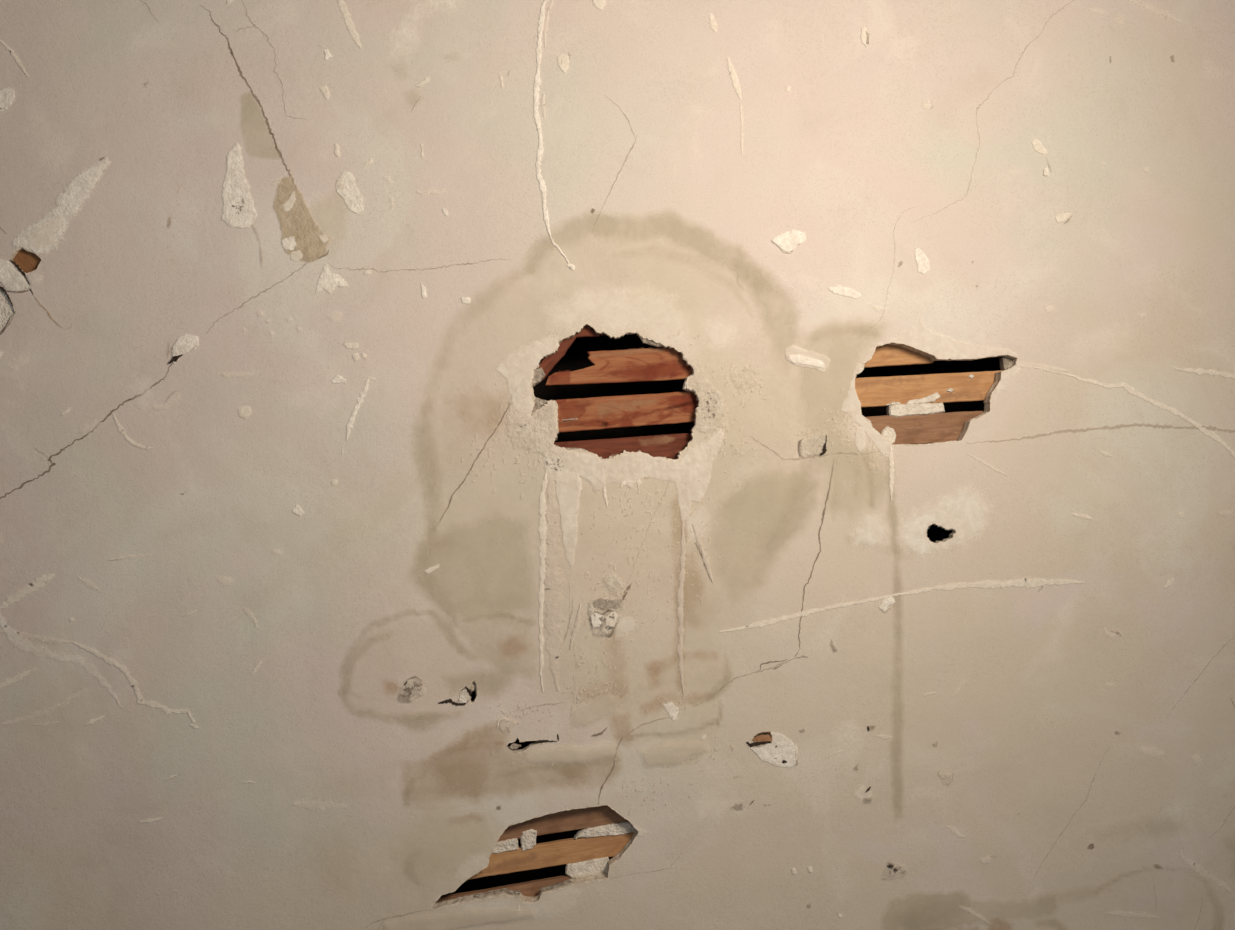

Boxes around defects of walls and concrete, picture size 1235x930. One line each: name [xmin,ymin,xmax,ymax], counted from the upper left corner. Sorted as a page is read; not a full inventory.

crack [200,5,297,189]
crack [0,227,61,335]
crack [0,363,173,499]
spalling [841,318,1020,501]
crack [975,424,1234,443]
spalling [473,323,767,692]
spalling [901,489,986,555]
spalling [746,731,798,768]
spalling [429,804,647,920]